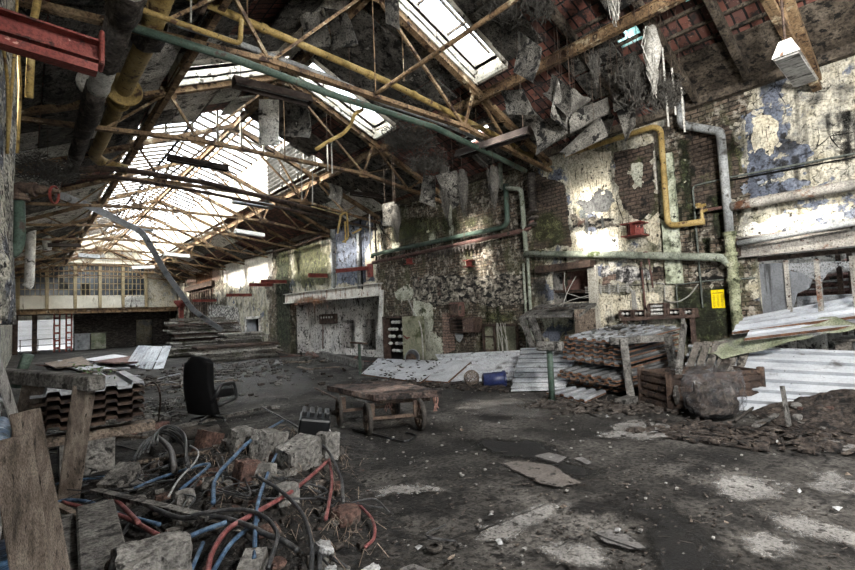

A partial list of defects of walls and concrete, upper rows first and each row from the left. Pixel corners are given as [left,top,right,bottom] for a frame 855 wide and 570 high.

spalling [684,104,832,209]
spalling [531,141,677,327]
peeling [743,198,829,237]
spalling [394,271,528,361]